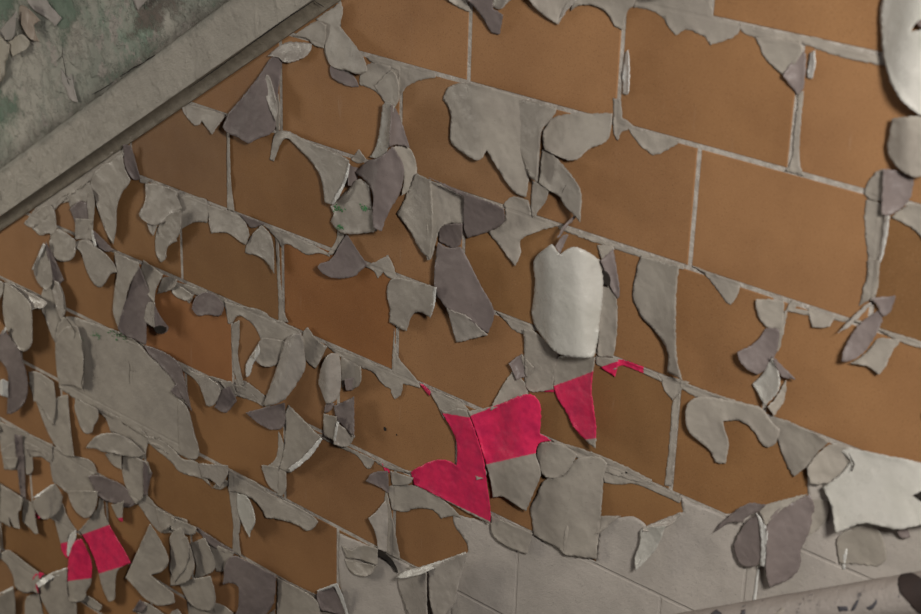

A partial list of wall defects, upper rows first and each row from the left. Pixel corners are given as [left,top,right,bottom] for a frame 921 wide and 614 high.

flaking render [0,0,62,82]
peeling [24,0,684,379]
peeling [530,0,921,415]
peeling [0,234,921,614]